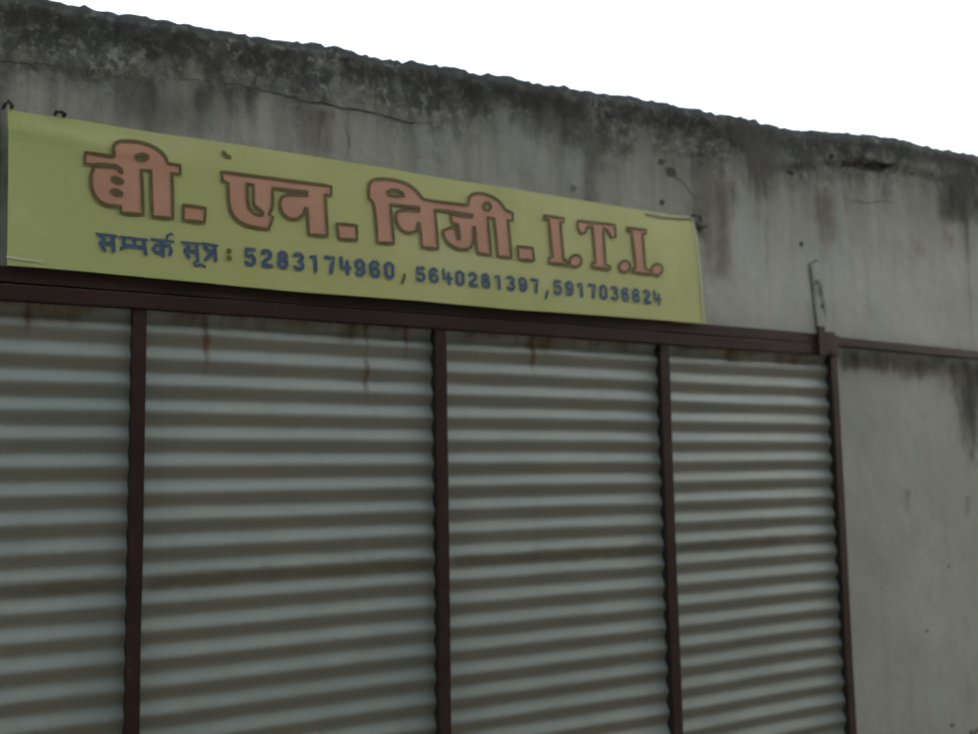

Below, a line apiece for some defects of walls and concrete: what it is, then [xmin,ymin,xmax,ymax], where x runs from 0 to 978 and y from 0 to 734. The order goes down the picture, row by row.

crack [188,71,440,153]